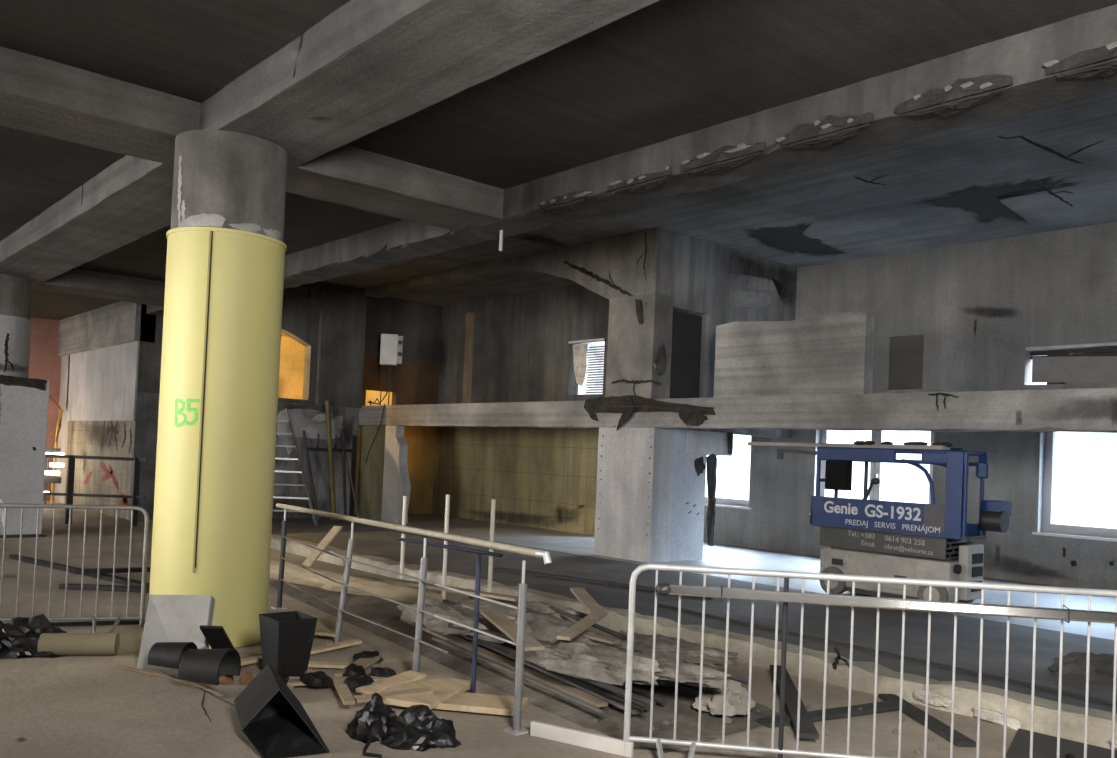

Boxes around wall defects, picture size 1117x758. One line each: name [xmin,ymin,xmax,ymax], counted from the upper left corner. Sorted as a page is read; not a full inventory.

crack [997,136,1103,164]
peeling [924,177,1076,222]
crack [1035,183,1073,207]
peeling [178,213,282,240]
peeling [749,224,845,256]
crack [564,233,647,296]
crack [4,333,14,372]